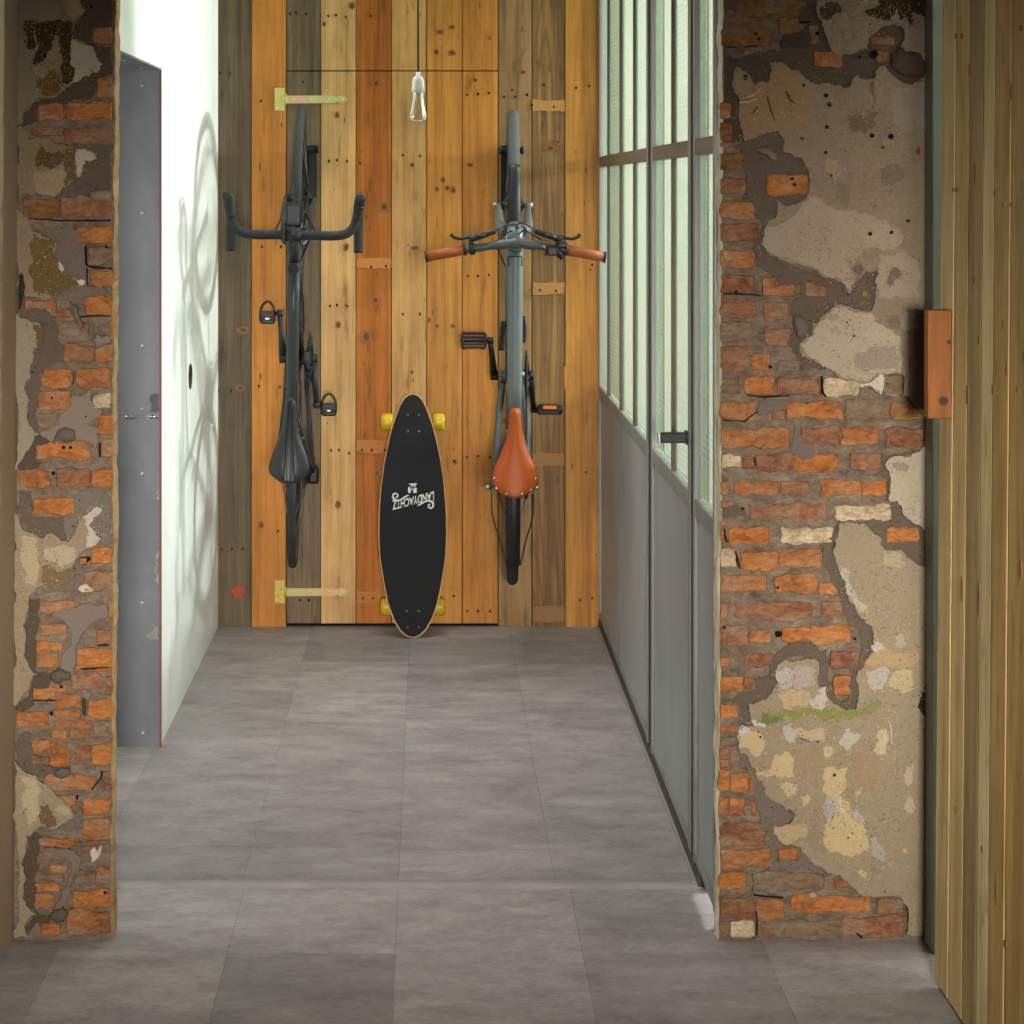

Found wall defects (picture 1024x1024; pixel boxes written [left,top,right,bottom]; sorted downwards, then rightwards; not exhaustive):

peeling [13,732,102,938]
peeling [13,489,111,712]
spalling [15,0,113,471]
peeling [723,0,925,937]